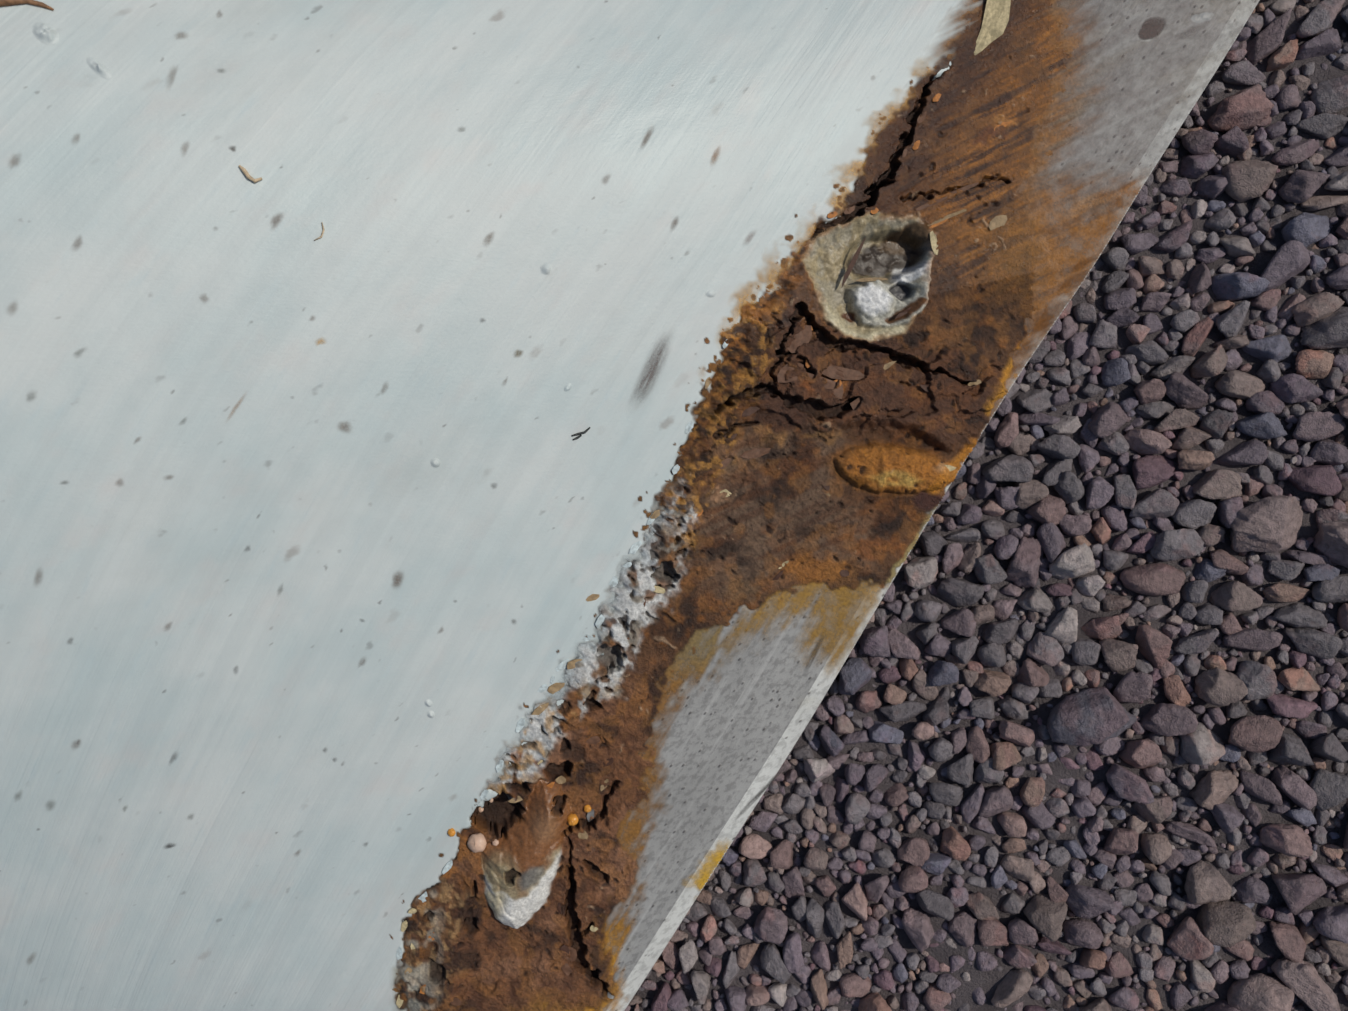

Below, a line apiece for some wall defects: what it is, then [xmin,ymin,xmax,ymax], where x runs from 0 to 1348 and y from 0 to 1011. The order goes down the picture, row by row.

crack [810,61,1011,241]
crack [713,303,974,439]
spalling [802,212,939,342]
corrosion [390,0,1143,1011]
peeling [487,480,699,800]
crack [563,780,621,1004]